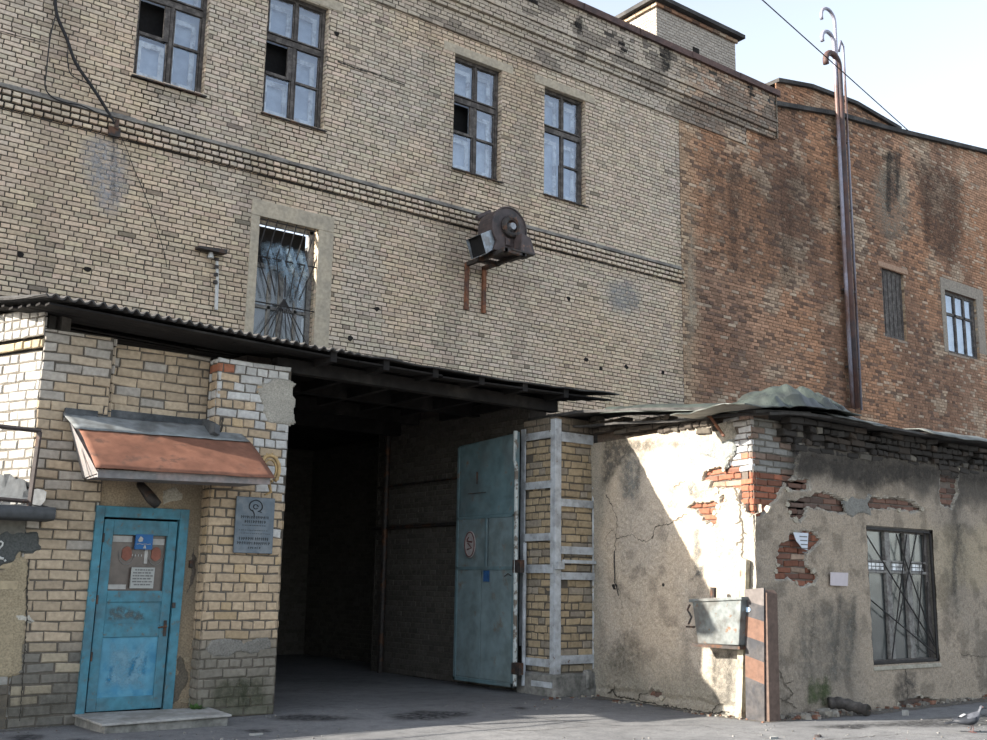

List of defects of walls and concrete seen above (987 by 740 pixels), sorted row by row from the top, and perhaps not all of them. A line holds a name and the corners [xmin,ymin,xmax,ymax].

crack [605,494,687,605]
spalling [690,416,848,586]
spalling [867,495,924,512]
spalling [939,468,960,508]